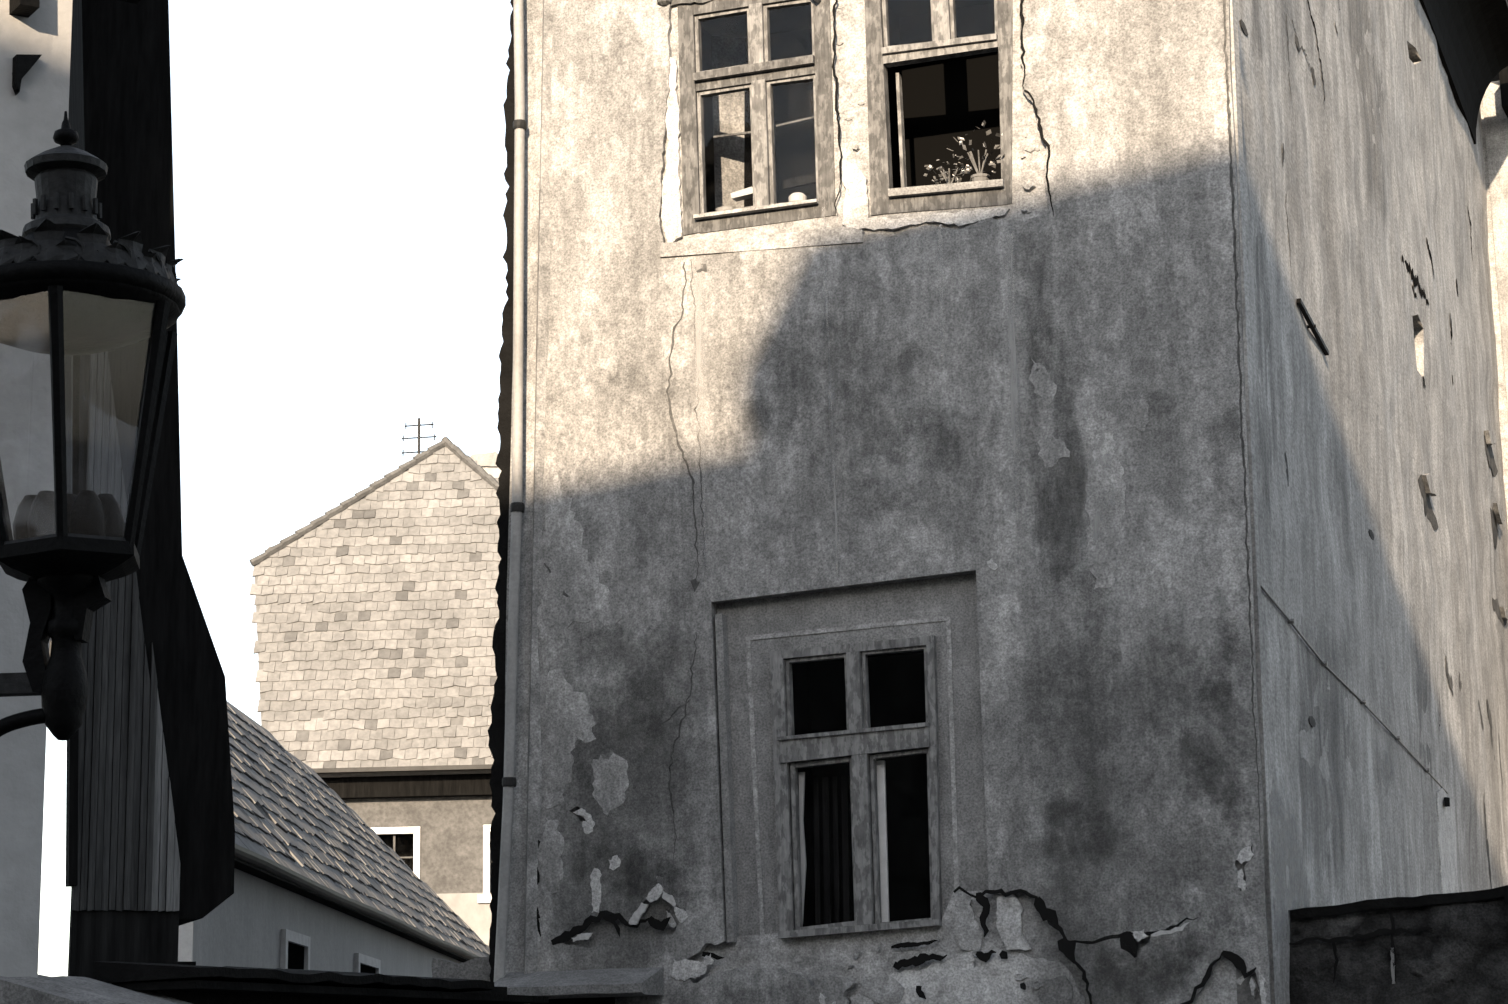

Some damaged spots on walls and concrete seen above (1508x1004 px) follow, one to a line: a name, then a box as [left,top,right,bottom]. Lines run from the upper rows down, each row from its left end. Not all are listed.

crack [1286,0,1341,110]
peeling [661,57,684,243]
peeling [842,144,1036,231]
crack [1282,144,1292,279]
crack [666,259,707,592]
crack [1223,0,1261,839]
peeling [1490,503,1505,548]
peeling [537,473,629,910]
crack [658,632,697,858]
flaking render [564,855,688,948]
flaking render [671,891,1097,1004]
flaking render [1191,956,1267,1004]